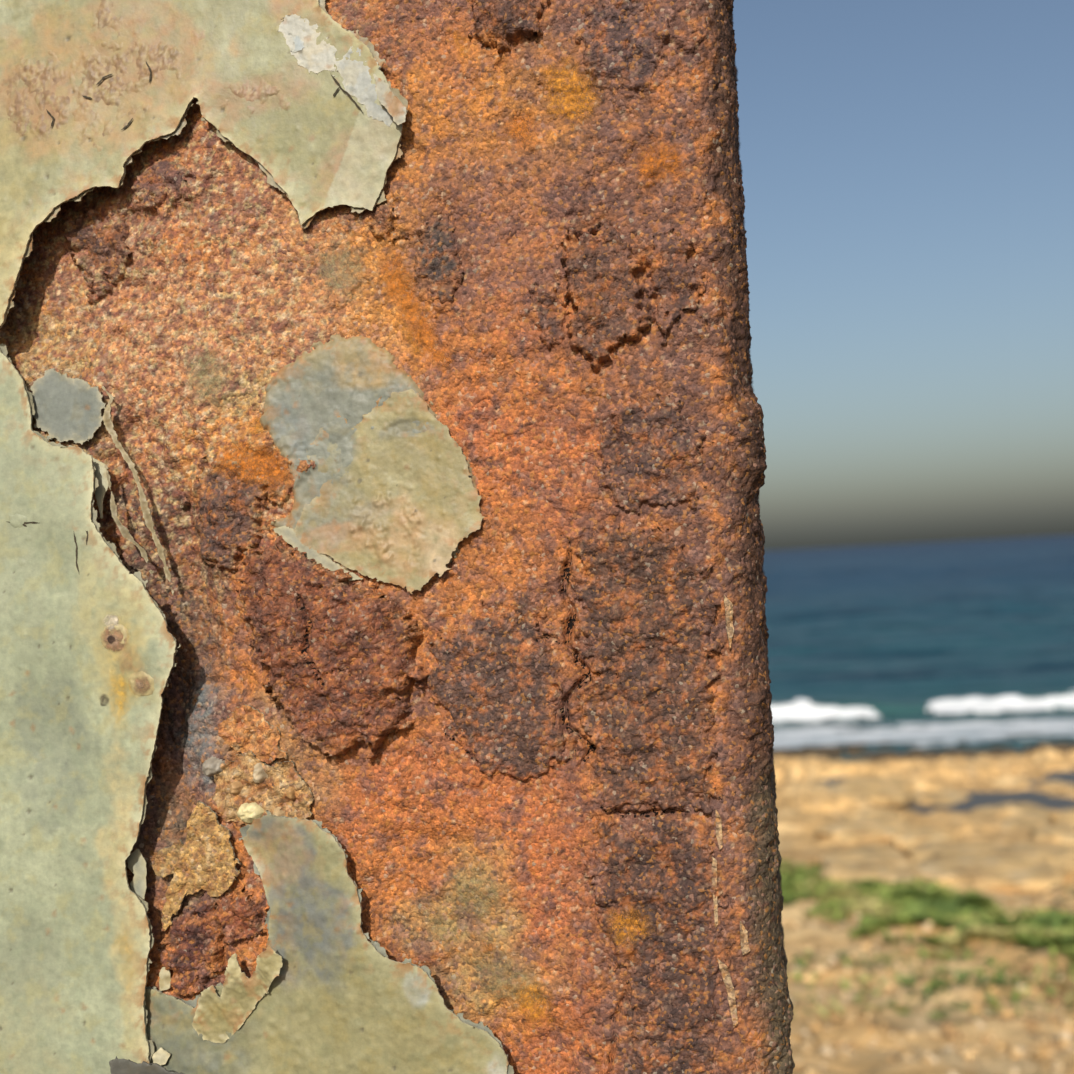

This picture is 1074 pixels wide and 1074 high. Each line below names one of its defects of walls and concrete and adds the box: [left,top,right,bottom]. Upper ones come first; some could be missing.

peeling [0,0,408,328]
corrosion [550,0,671,118]
corrosion [366,202,465,361]
corrosion [528,219,707,373]
peeling [0,334,514,1074]
corrosion [180,393,736,1074]
crack [535,535,618,767]